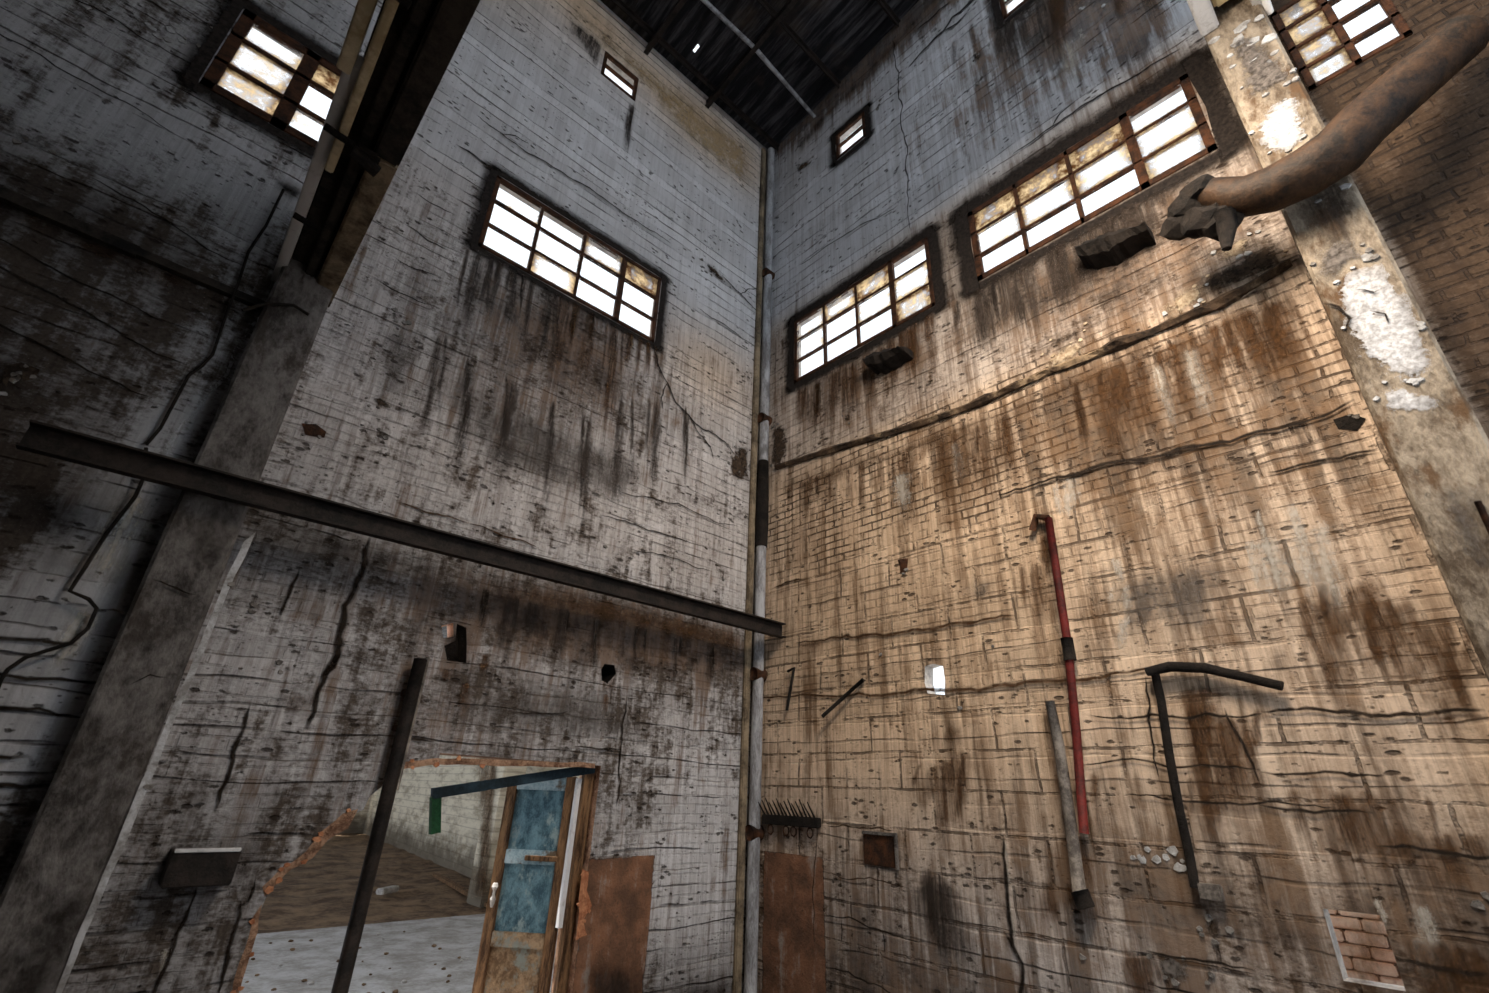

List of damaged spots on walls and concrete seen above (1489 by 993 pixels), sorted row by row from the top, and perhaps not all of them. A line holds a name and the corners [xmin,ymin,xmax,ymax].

water stain [995,0,1066,61]
water stain [458,249,557,347]
water stain [424,337,447,426]
water stain [457,364,660,509]
crack [307,539,370,725]
crack [216,707,250,807]
spalling [404,755,595,770]
crack [152,887,197,993]
spalling [230,808,358,993]
water stain [915,872,970,957]
crack [1002,839,1025,993]